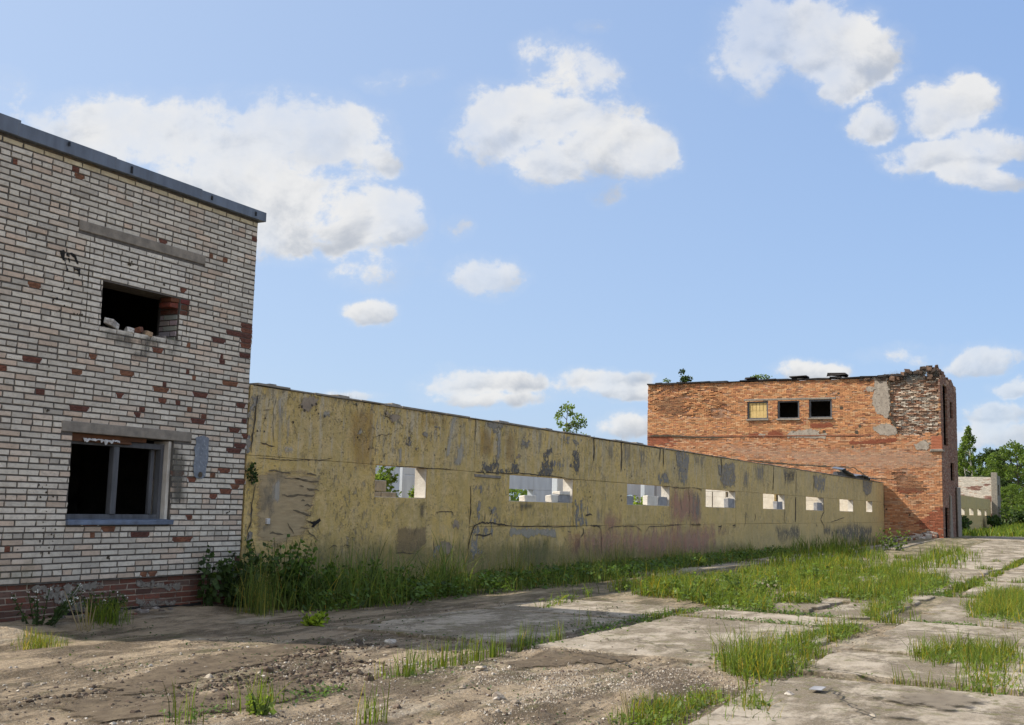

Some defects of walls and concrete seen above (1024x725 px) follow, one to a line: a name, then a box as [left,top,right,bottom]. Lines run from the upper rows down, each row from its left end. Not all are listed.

spalling [849,376,941,448]
spalling [269,469,321,540]
peeling [470,422,556,559]
peeling [537,435,582,477]
crack [439,435,756,555]